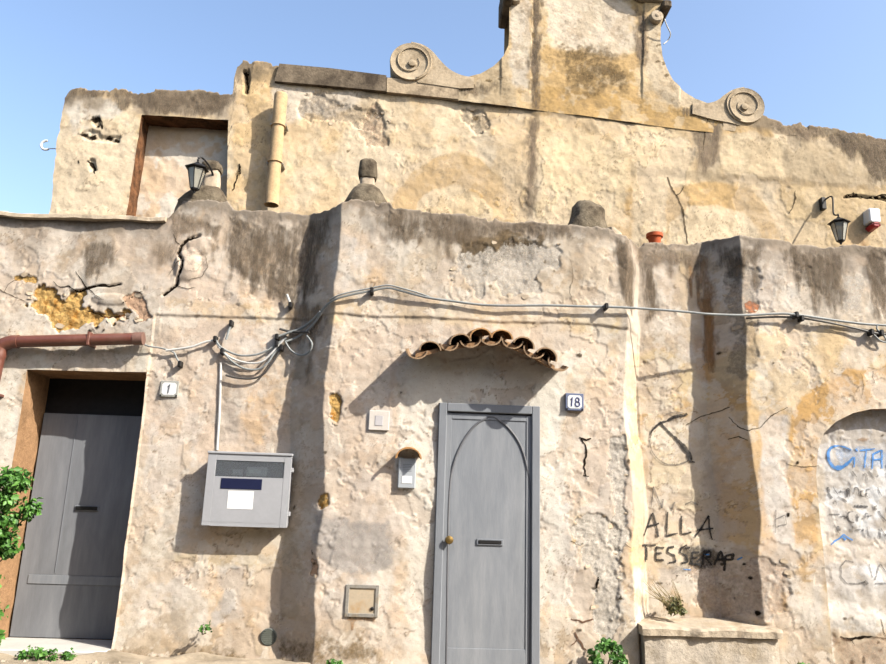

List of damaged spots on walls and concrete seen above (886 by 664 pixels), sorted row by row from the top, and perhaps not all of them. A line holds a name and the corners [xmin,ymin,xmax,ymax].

water stain [562,43,627,97]
water stain [386,0,571,277]
crack [667,177,688,244]
flaking render [14,273,152,333]
crack [53,272,140,318]
crack [164,234,201,296]
water stain [171,215,328,346]
water stain [616,240,703,322]
water stain [785,247,886,318]
flaking render [329,393,347,426]
crack [579,437,591,477]
peeling [570,435,630,639]